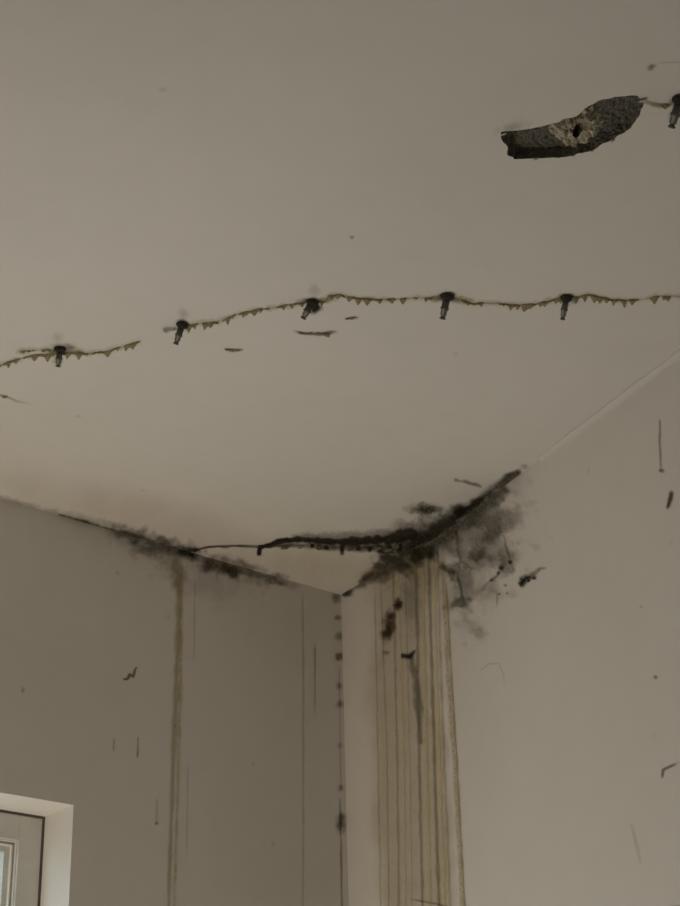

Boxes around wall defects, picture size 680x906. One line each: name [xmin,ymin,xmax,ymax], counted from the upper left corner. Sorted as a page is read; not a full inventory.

crack [645,102,674,110]
spalling [501,95,647,161]
crack [187,294,433,338]
crack [461,294,670,312]
crack [0,341,140,368]
leakage [59,515,198,558]
leakage [206,561,238,578]
leakage [348,470,520,906]